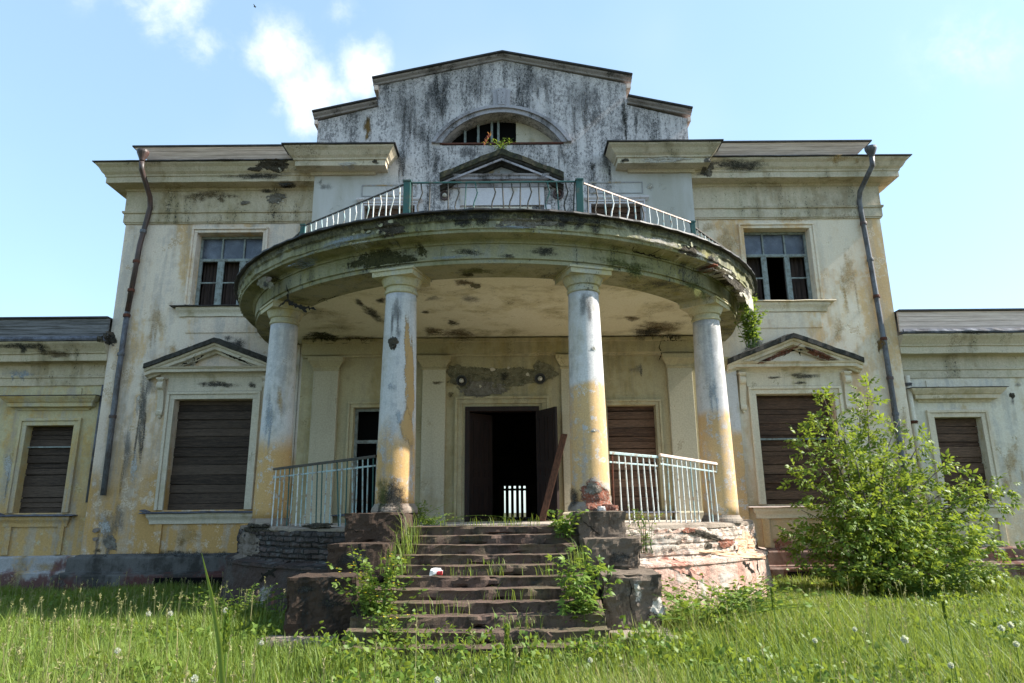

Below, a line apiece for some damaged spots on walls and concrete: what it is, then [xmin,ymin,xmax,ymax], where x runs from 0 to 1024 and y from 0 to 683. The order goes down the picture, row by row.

leakage [714,160,762,171]
leakage [417,209,496,227]
leakage [529,212,603,235]
leakage [347,244,427,269]
leakage [0,343,75,357]
leakage [304,332,371,344]
leakage [628,317,682,341]
peeling [388,318,415,446]
flaking render [446,360,559,398]
leakage [121,380,151,478]
flaking render [570,477,612,512]
spalling [644,527,735,596]